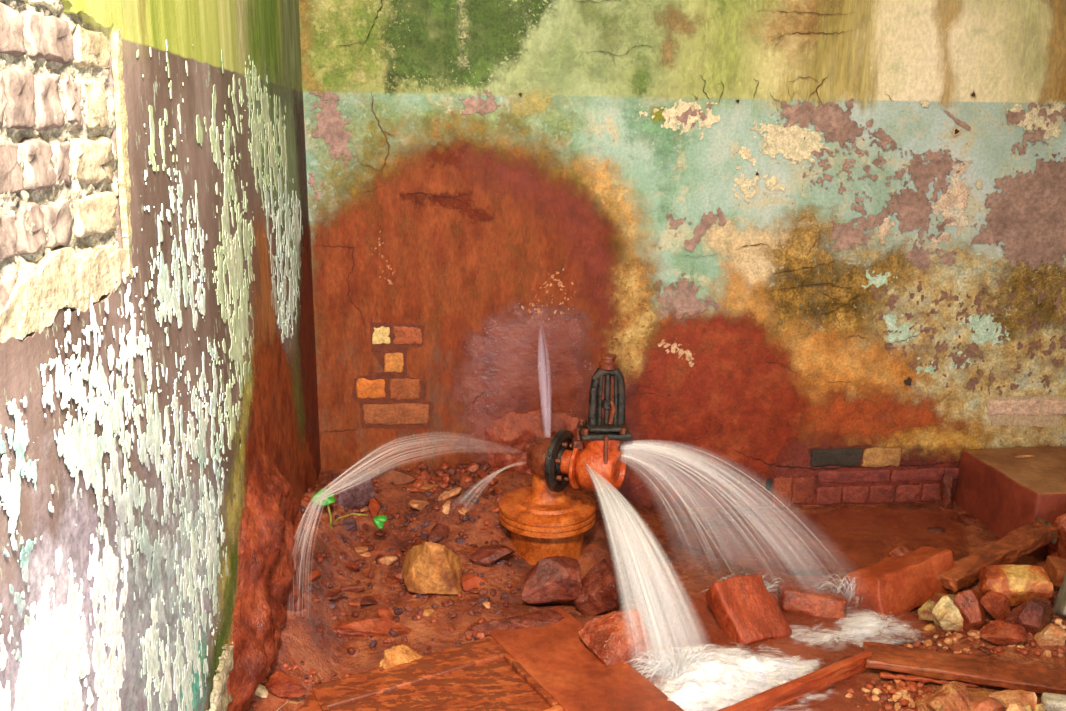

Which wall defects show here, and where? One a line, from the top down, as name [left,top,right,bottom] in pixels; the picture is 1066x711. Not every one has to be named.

peeling [637,97,721,140]
crack [753,74,829,103]
crack [752,10,859,49]
water stain [937,0,962,106]
water stain [1039,0,1066,105]
peeling [732,98,1066,427]
flaking render [0,0,303,711]
flaking render [352,322,433,429]
water stain [454,304,595,465]
rust [242,118,1019,515]
peeling [658,340,695,367]
water stain [0,497,140,711]